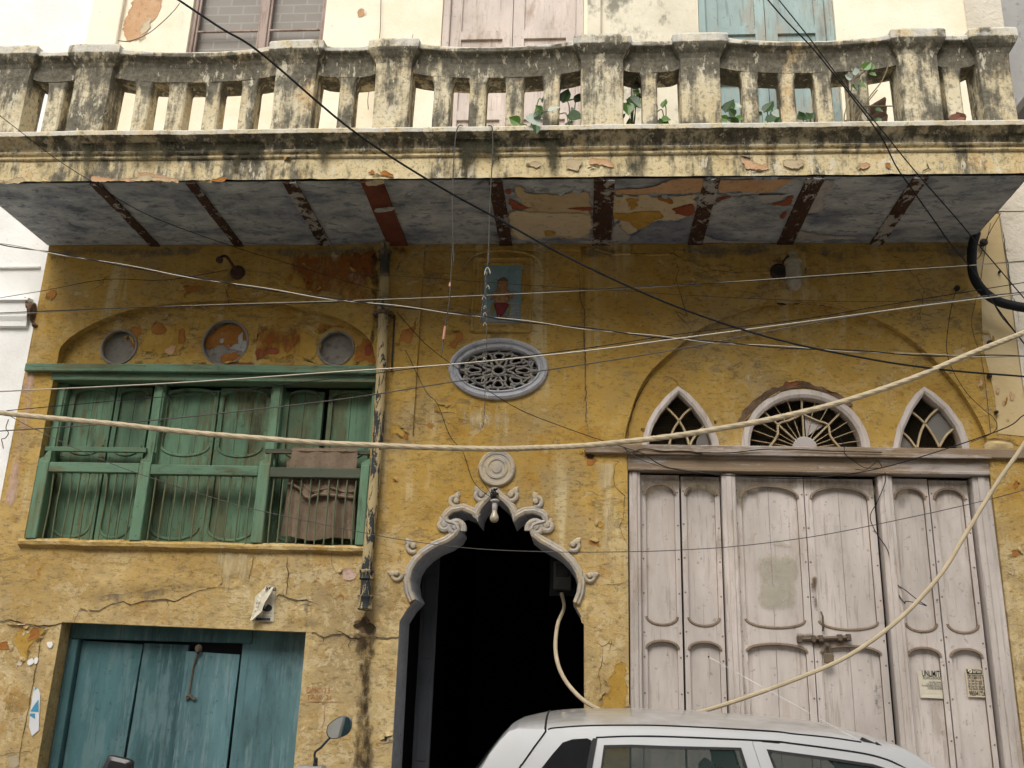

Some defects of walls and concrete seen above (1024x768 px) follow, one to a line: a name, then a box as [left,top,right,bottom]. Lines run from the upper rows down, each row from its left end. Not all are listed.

peeling [122,0,162,42]
flaking render [91,172,178,184]
peeling [505,186,593,240]
flaking render [566,158,614,171]
peeling [611,155,805,241]
peeling [205,324,344,365]
peeling [344,338,376,366]
peeling [0,621,53,668]
crack [0,557,255,767]
damp [353,635,374,768]
peeling [599,661,630,708]